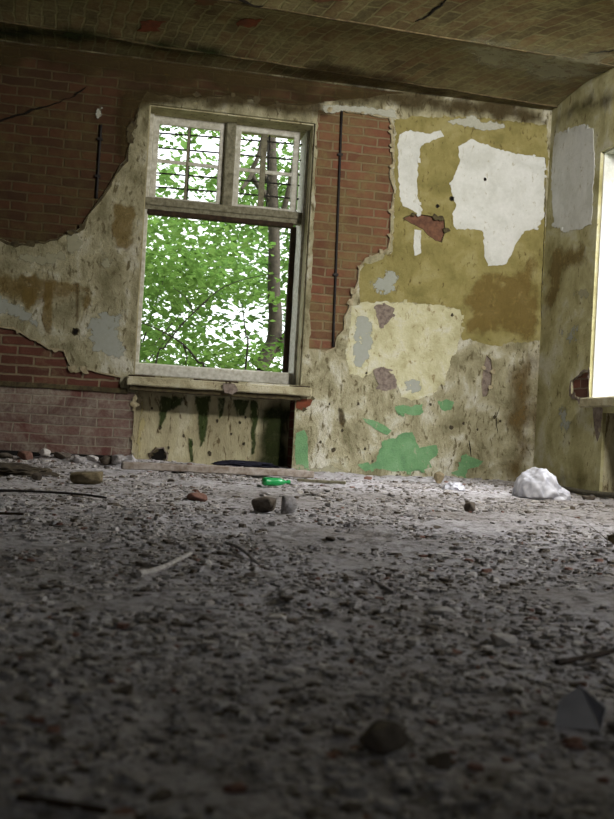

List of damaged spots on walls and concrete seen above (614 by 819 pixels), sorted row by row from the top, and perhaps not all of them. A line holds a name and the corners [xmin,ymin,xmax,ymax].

crack [415,0,446,22]
crack [0,87,86,122]
spalling [0,50,595,416]
water stain [465,260,537,338]
water stain [548,244,585,308]
spalling [0,327,139,456]
water stain [218,398,258,454]
peeling [357,418,438,476]
peeling [451,454,483,478]